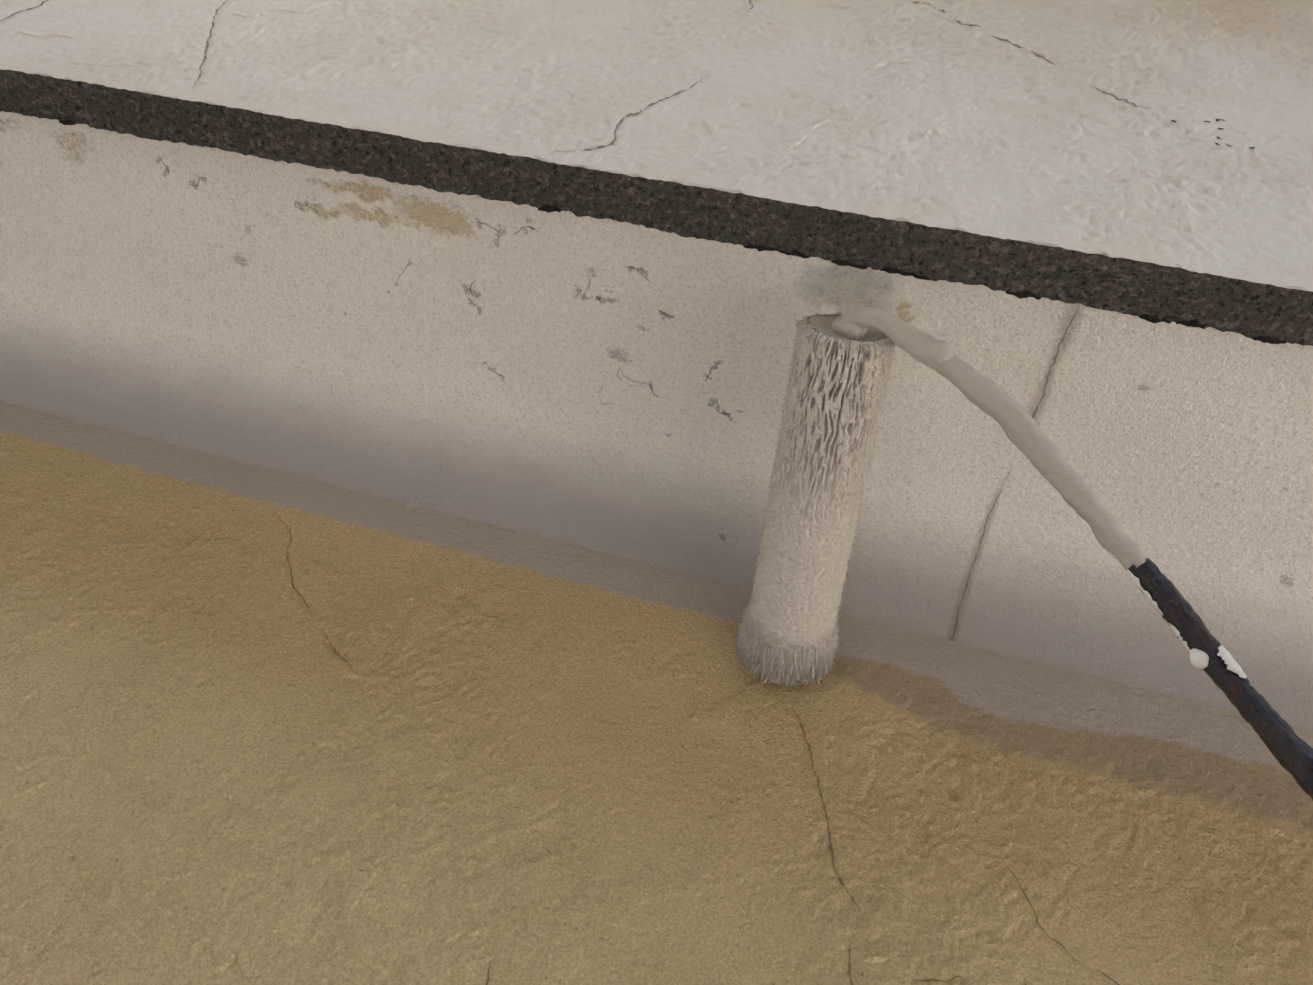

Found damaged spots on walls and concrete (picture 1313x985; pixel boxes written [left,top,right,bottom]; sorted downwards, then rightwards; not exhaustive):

crack [0,0,51,21]
crack [195,2,225,83]
crack [912,0,1055,65]
crack [552,78,702,154]
crack [1090,86,1149,108]
crack [840,947,853,985]